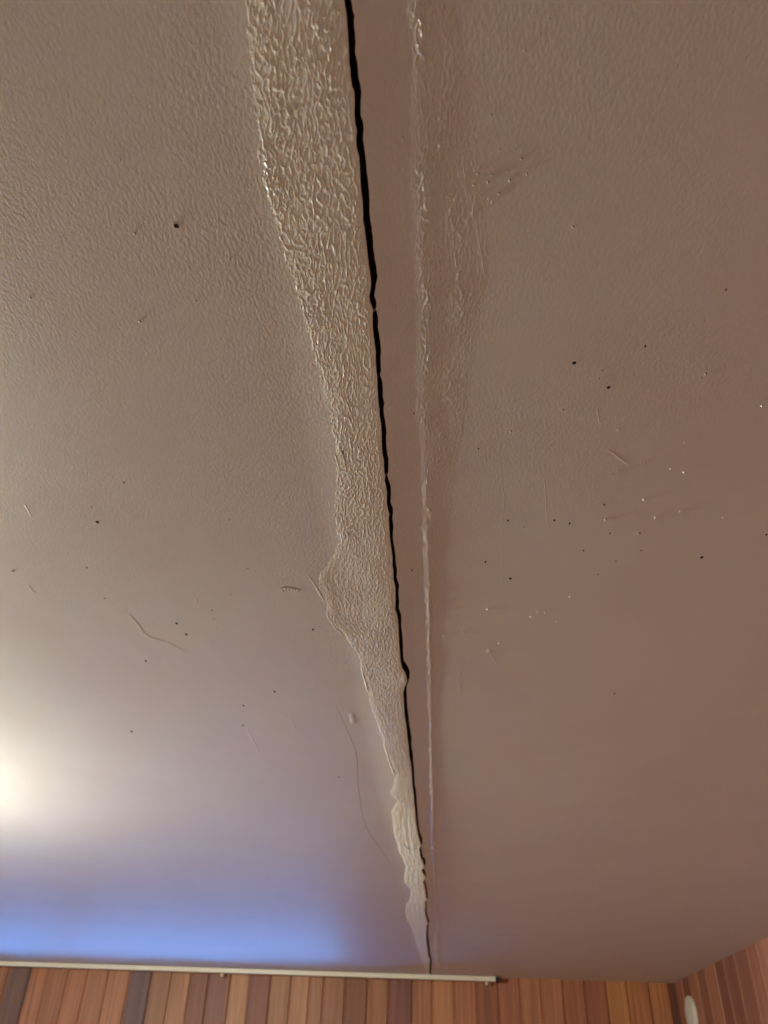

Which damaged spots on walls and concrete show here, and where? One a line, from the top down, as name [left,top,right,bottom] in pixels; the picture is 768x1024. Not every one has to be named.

crack [345,0,432,974]